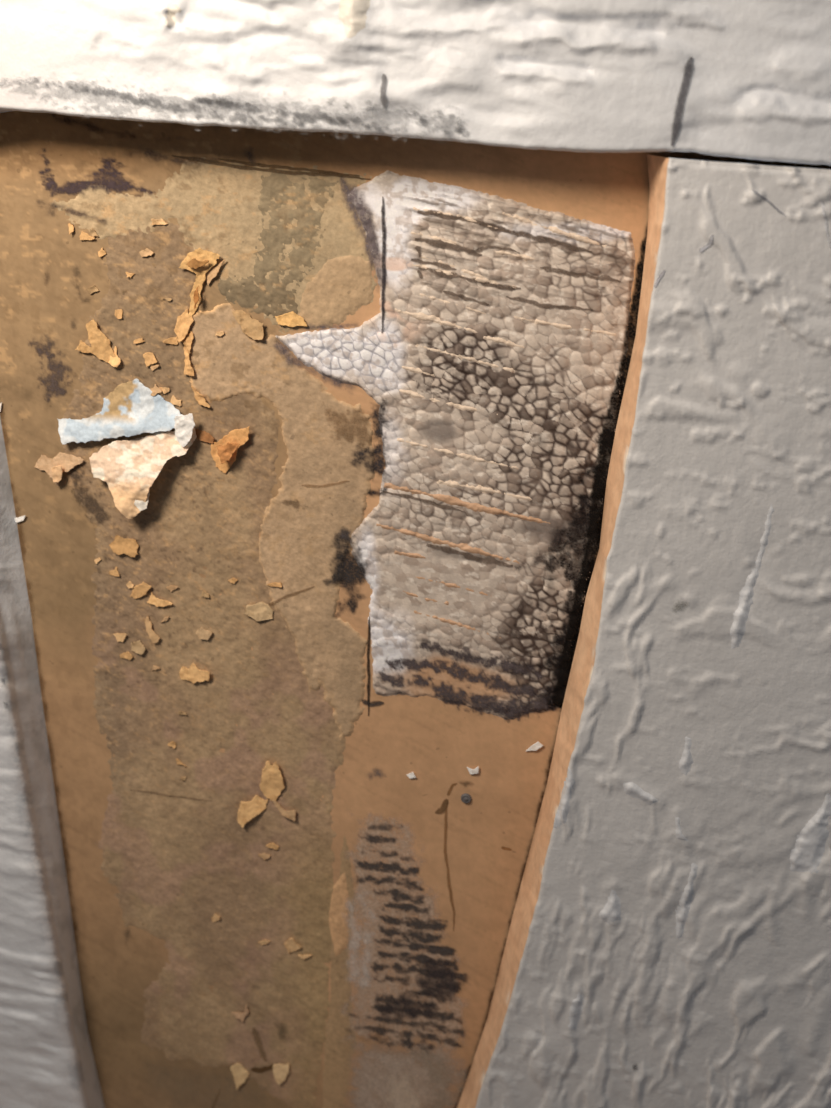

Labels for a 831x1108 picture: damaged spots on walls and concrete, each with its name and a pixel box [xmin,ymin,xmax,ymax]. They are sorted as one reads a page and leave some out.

damp [33,78,382,132]
damp [341,179,386,282]
peeling [232,310,308,340]
peeling [35,248,250,520]
damp [328,404,386,475]
peeling [109,535,139,558]
damp [324,530,365,617]
damp [379,433,603,720]
peeling [113,581,178,660]
peeling [179,663,210,684]
peeling [237,761,296,828]
damp [347,825,467,1108]